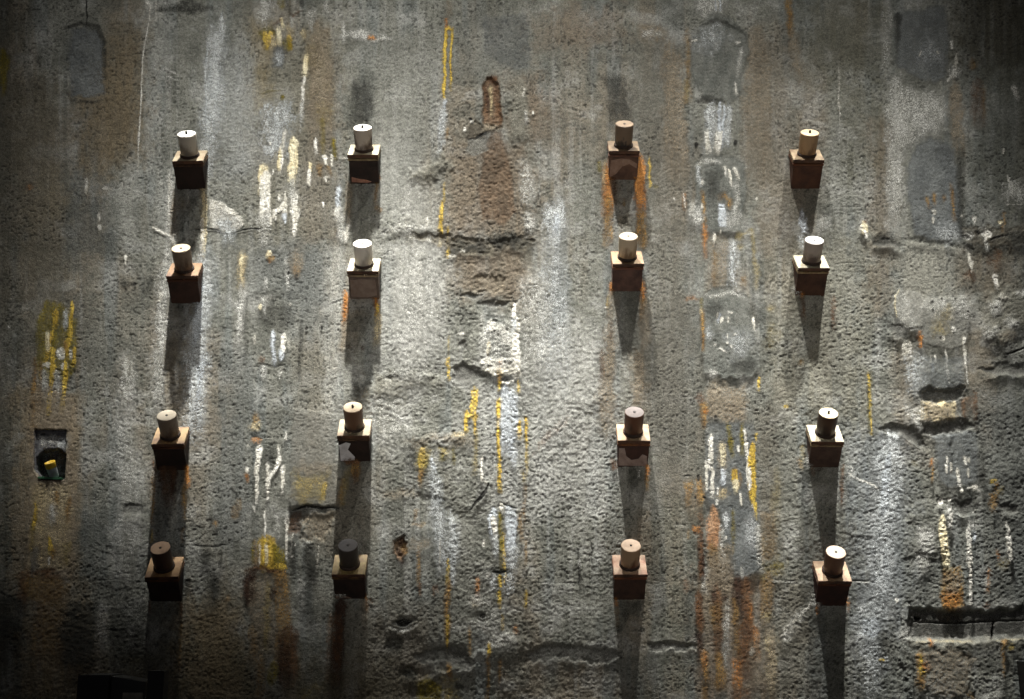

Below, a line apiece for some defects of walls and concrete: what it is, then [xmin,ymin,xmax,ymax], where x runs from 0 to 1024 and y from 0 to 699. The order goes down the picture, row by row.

damp [235,0,350,380]
spalling [411,76,535,257]
corrosion [602,156,647,246]
damp [673,27,771,287]
spalling [920,387,965,404]
spalling [392,530,407,564]
crack [470,479,519,510]
corrosion [684,507,764,699]
damp [685,377,810,694]
corrosion [941,566,963,612]